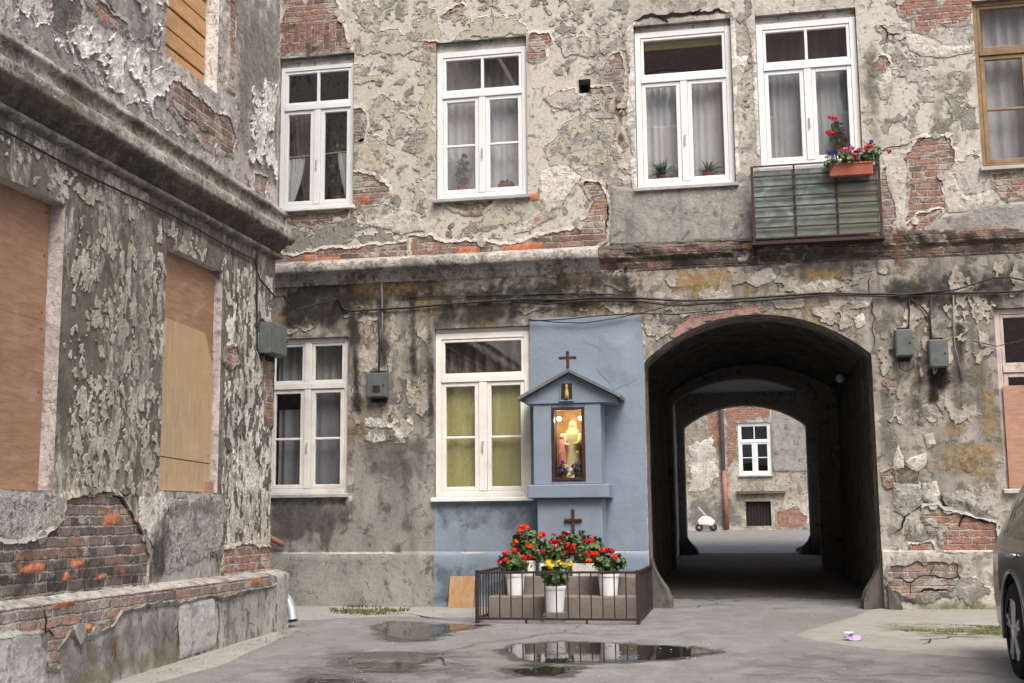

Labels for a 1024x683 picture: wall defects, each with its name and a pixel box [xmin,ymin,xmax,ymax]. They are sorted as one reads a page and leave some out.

crack [634,8,730,22]
flaking render [15,0,279,197]
flaking render [275,0,630,263]
flaking render [861,0,1024,234]
flaking render [0,135,298,674]
leakage [360,281,434,414]
leakage [804,268,840,281]
peeling [878,304,937,424]
peeling [943,264,996,364]
crack [895,565,966,595]
flaking render [879,390,1001,608]
crack [895,495,1000,533]